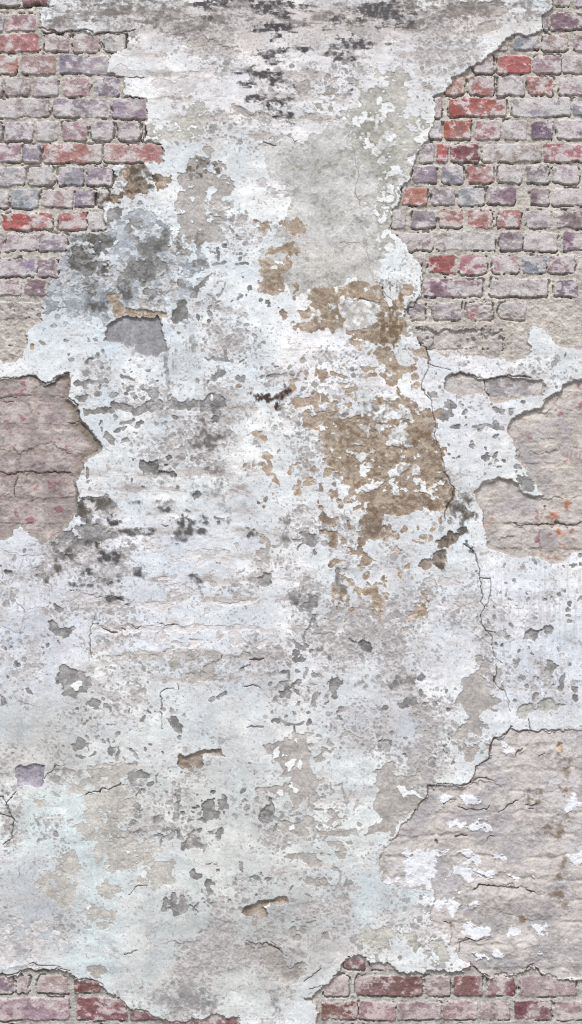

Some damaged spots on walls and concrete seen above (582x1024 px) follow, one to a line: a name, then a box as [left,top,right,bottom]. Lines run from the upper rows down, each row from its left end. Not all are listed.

crack [1,471,71,498]
crack [0,372,97,442]
flaking render [0,0,582,633]
crack [418,339,532,522]
peeling [15,665,232,931]
flaking render [239,594,582,1024]
flaking render [0,917,241,1024]